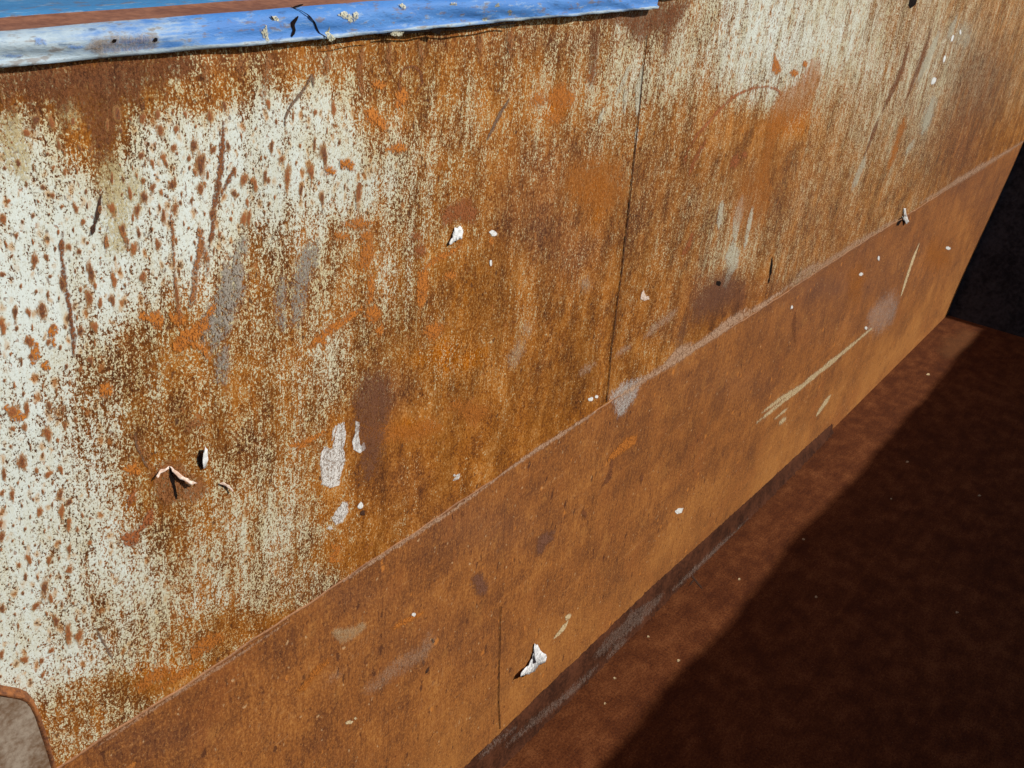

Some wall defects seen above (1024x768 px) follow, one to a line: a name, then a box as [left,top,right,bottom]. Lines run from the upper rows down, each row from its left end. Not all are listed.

corrosion [586,0,691,84]
corrosion [91,195,108,249]
corrosion [138,121,235,361]
spalling [344,182,362,207]
peeling [449,226,463,245]
corrosion [48,232,77,356]
spalling [0,100,356,683]
corrosion [121,436,208,547]
peeling [320,421,366,488]
peeling [328,502,363,530]
peeling [520,644,547,677]
corrosion [0,685,56,768]